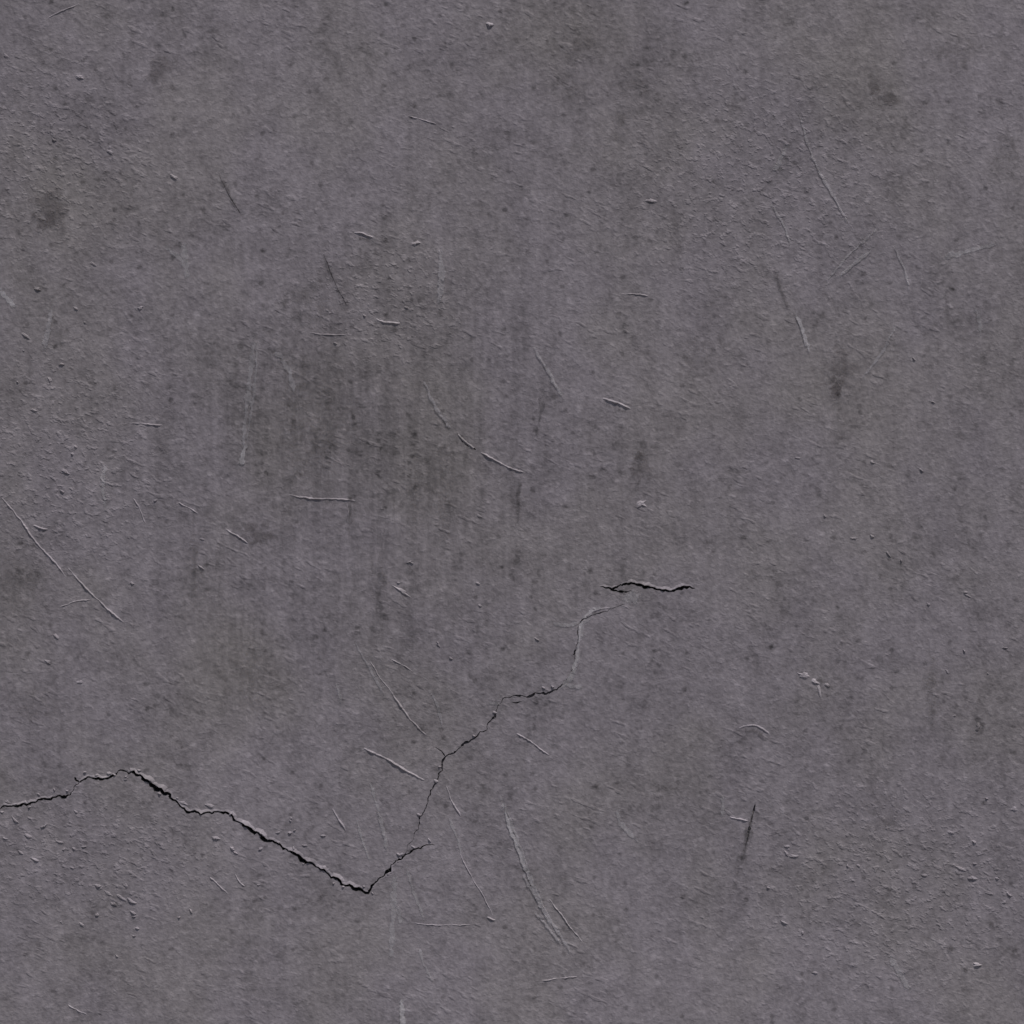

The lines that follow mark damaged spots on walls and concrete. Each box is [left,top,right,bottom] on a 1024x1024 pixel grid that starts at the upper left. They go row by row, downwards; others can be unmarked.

crack [0,579,695,895]